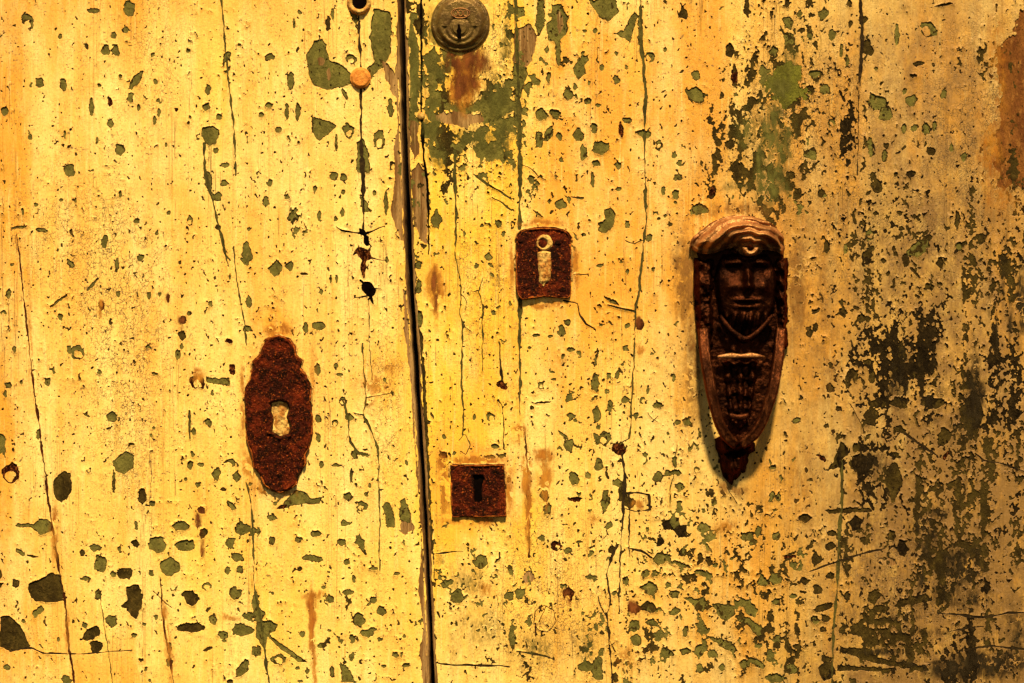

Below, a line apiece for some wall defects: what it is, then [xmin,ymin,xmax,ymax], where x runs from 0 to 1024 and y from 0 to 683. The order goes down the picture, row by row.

peeling [78,75,114,132]
peeling [54,0,160,63]
peeling [119,29,217,125]
peeling [187,73,223,154]
rust [446,49,489,112]
crack [9,234,132,683]
peeling [32,151,293,414]
peeling [0,363,424,683]
crack [336,15,394,571]
rust [438,456,502,524]
peeling [218,0,1024,683]
crack [598,0,678,683]